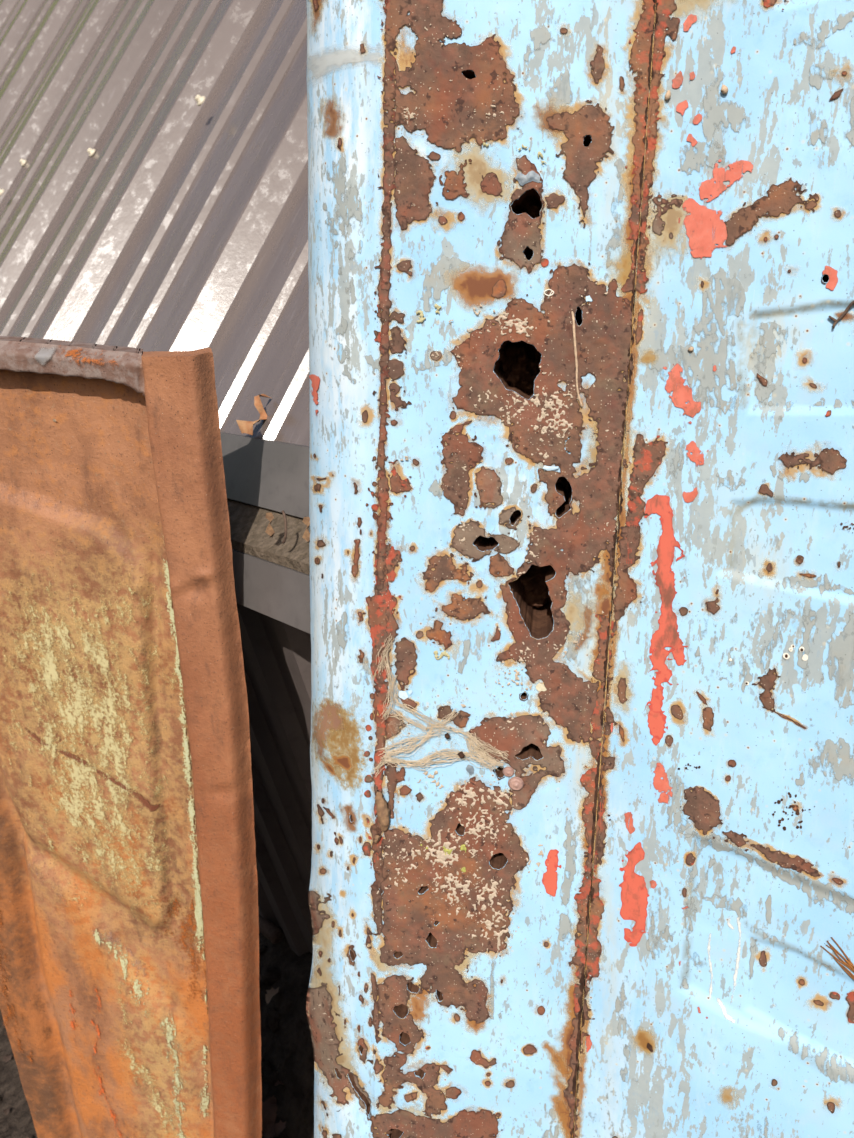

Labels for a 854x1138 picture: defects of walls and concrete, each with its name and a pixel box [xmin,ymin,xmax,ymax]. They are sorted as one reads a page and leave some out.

peeling [672,71,695,88]
peeling [676,65,753,259]
peeling [649,267,793,424]
rust [778,446,847,479]
rust [306,0,714,1138]
peeling [643,488,700,745]
rust [705,588,720,615]
rust [752,668,806,729]
peeling [619,763,854,989]
rust [680,786,847,887]
rust [755,950,770,971]
peeling [615,976,631,1082]